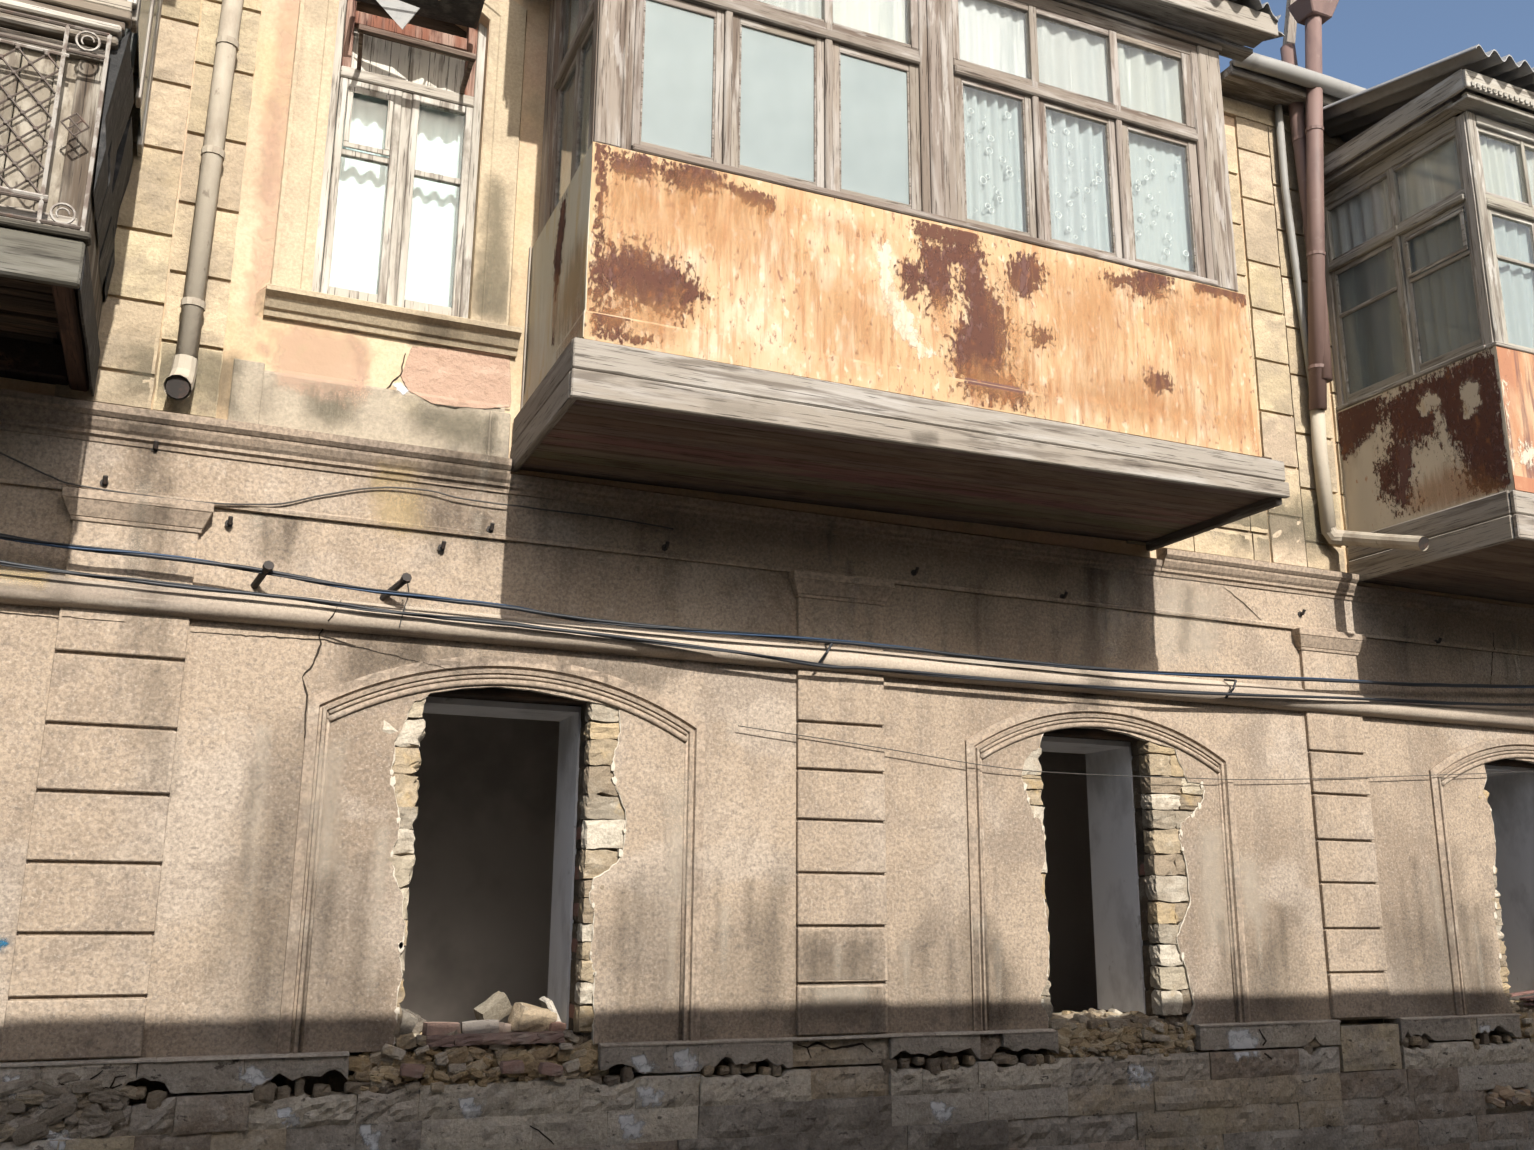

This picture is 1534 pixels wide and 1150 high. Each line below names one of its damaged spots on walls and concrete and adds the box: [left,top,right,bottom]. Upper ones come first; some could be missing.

rust [552,193,567,299]
rust [585,143,776,345]
rust [876,219,1056,414]
rust [1337,347,1534,519]
crack [190,601,455,738]
spalling [346,696,627,1093]
flaking render [1021,733,1205,1062]
flaking render [1492,862,1534,1042]
spalling [0,1066,138,1150]